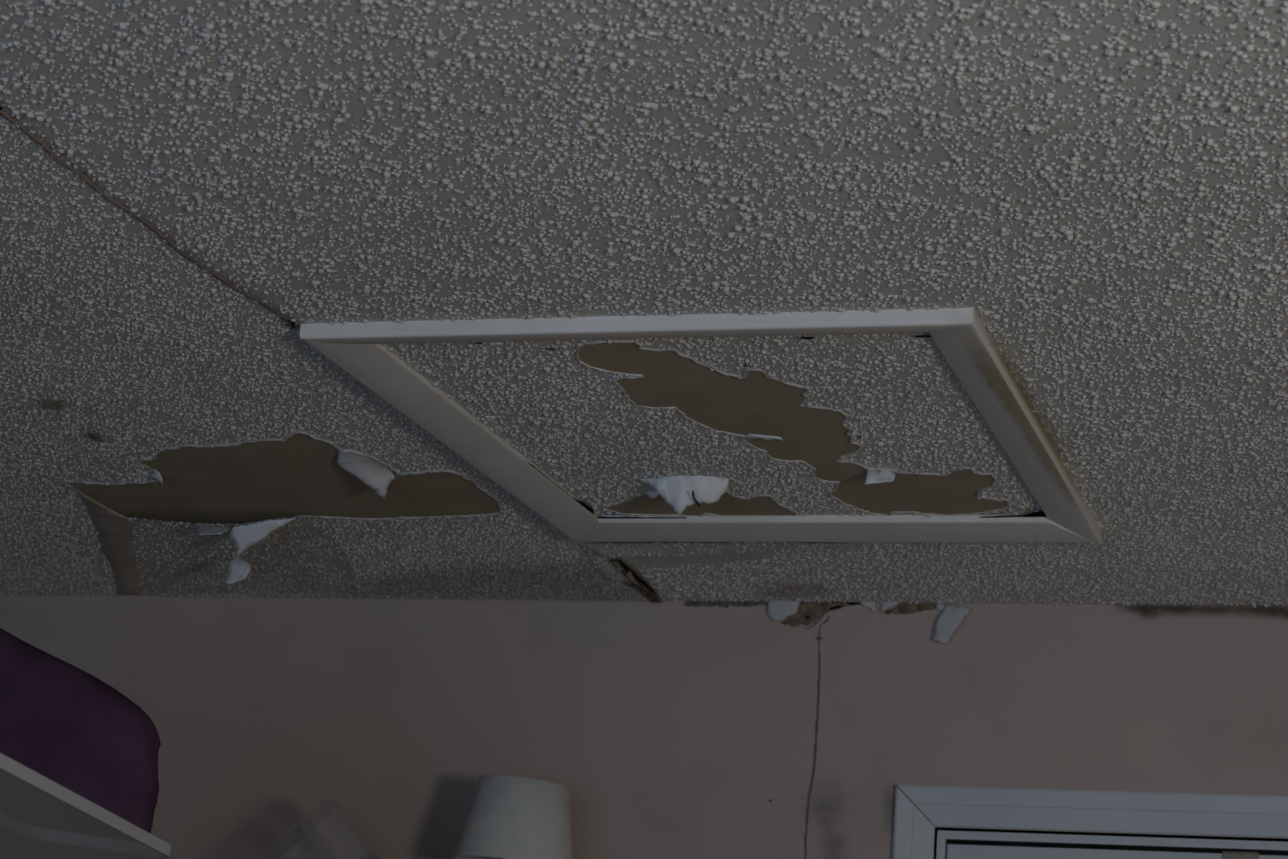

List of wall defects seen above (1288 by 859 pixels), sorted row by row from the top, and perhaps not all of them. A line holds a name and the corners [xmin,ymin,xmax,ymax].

crack [0,107,298,330]
peeling [575,340,1010,517]
peeling [62,430,504,595]
crack [580,542,858,603]
spalling [684,601,971,644]
water stain [1130,604,1288,617]
crack [804,613,830,859]